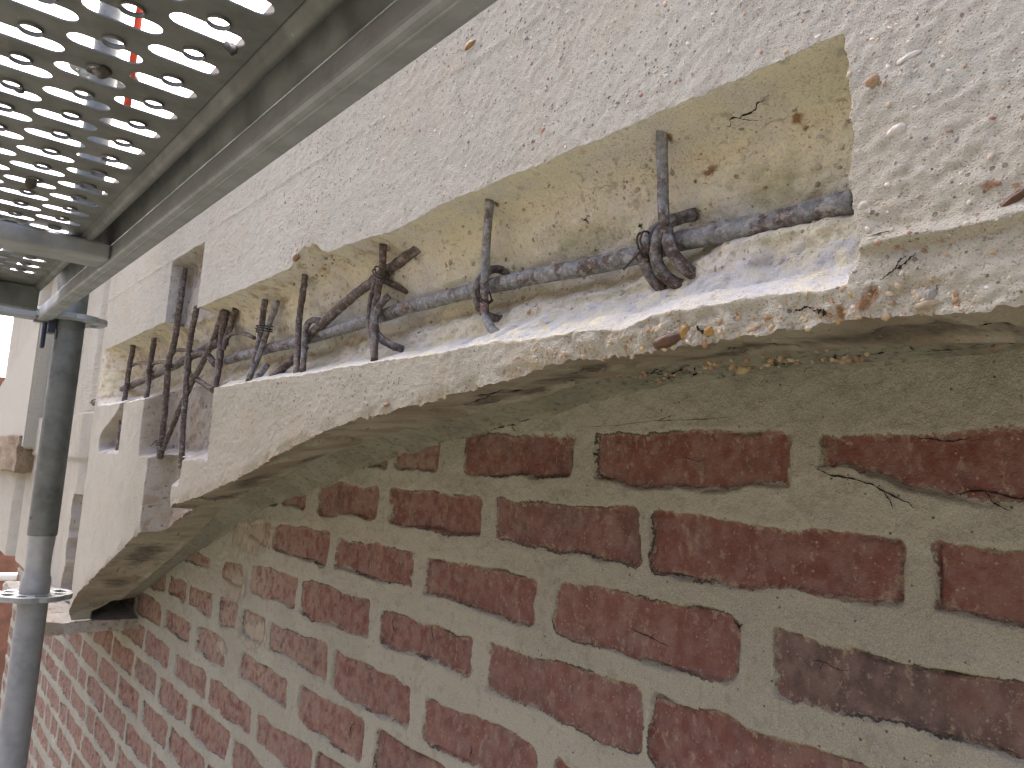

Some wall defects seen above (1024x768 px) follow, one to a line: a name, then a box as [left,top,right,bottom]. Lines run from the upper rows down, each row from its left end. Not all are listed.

crack [726,100,764,127]
spalling [97,0,1013,532]
crack [881,253,916,280]
rust [856,289,878,311]
crack [811,464,913,509]
crack [952,489,1024,511]